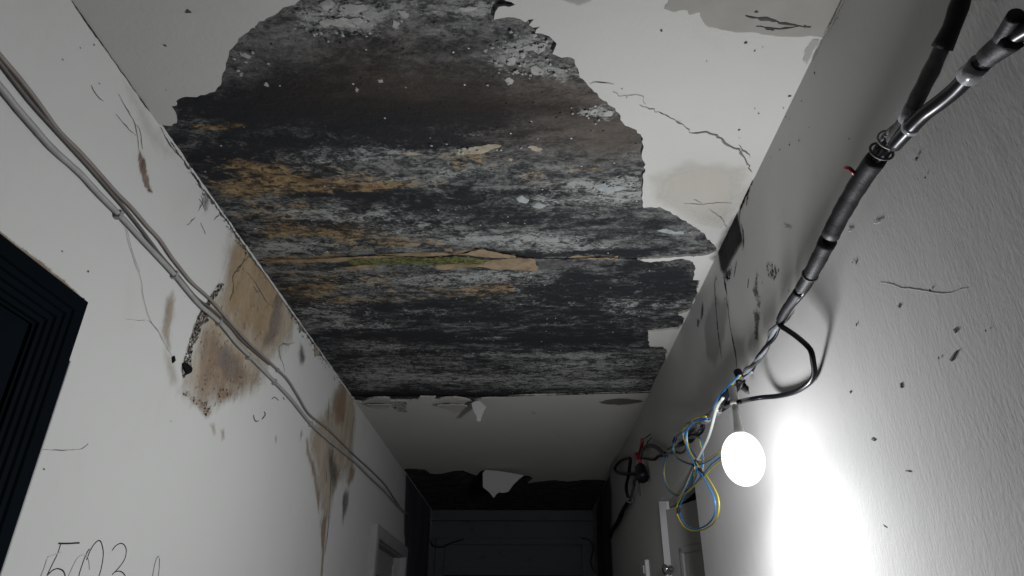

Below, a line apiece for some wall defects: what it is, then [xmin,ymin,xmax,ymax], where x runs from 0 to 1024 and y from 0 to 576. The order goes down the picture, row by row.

crack [591,82,752,172]
flaking render [162,0,742,412]
damp [165,299,173,337]
damp [172,242,294,416]
crack [886,283,968,294]
damp [301,386,354,576]
flaking render [404,468,606,510]